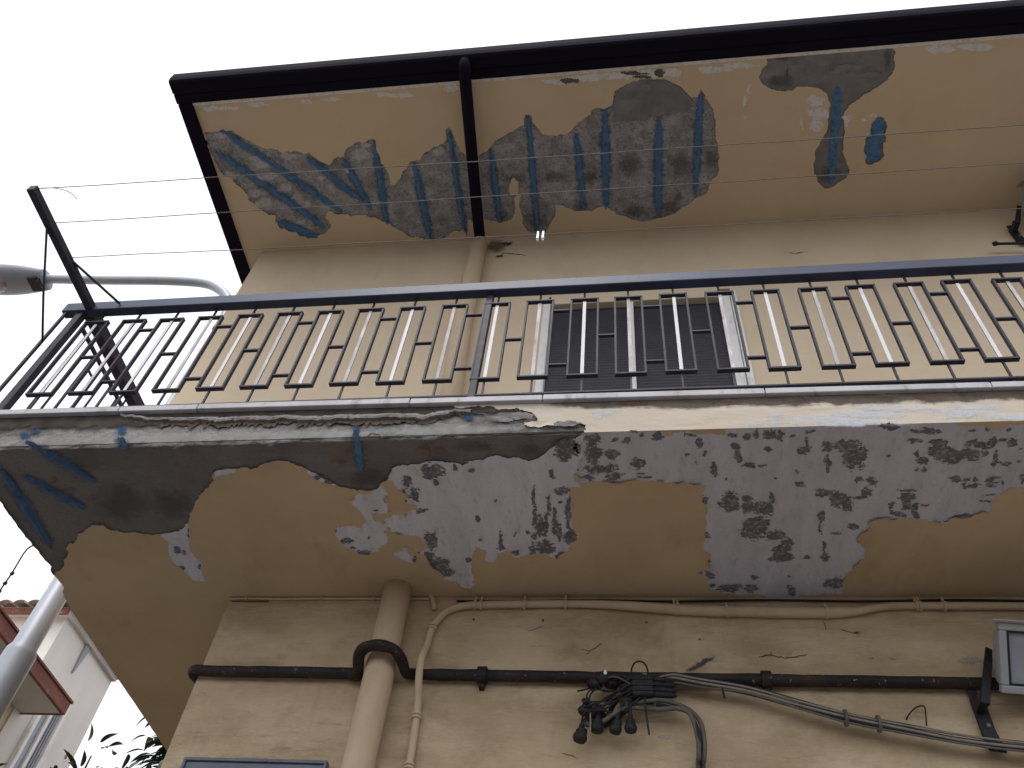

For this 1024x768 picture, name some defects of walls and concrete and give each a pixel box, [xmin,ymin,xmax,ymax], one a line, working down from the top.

spalling [202,68,720,241]
spalling [698,48,896,189]
peeling [0,406,1024,597]
crack [759,651,806,659]